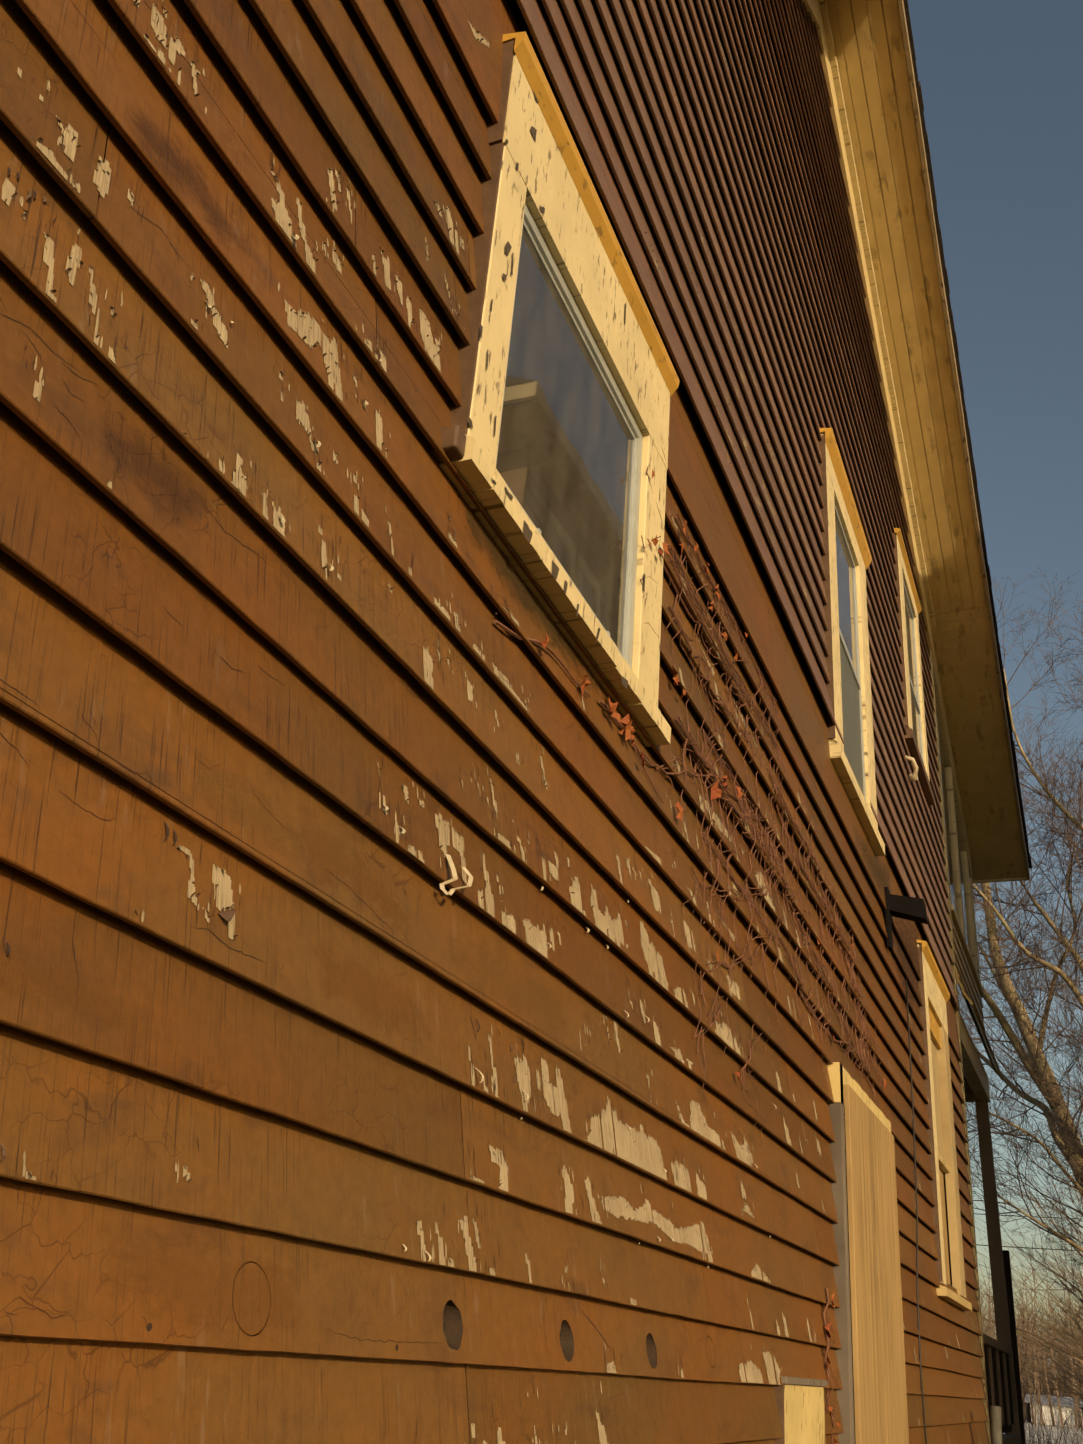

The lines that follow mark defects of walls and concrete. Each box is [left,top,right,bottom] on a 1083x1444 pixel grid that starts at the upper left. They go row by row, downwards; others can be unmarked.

peeling [18,67,111,198]
peeling [2,166,129,363]
peeling [270,151,344,275]
peeling [278,283,391,458]
peeling [368,240,449,373]
peeling [423,596,533,732]
peeling [164,822,241,940]
peeling [377,757,561,959]
peeling [460,763,696,1008]
peeling [616,748,814,1059]
peeling [468,1019,713,1268]
peeling [670,1089,758,1168]